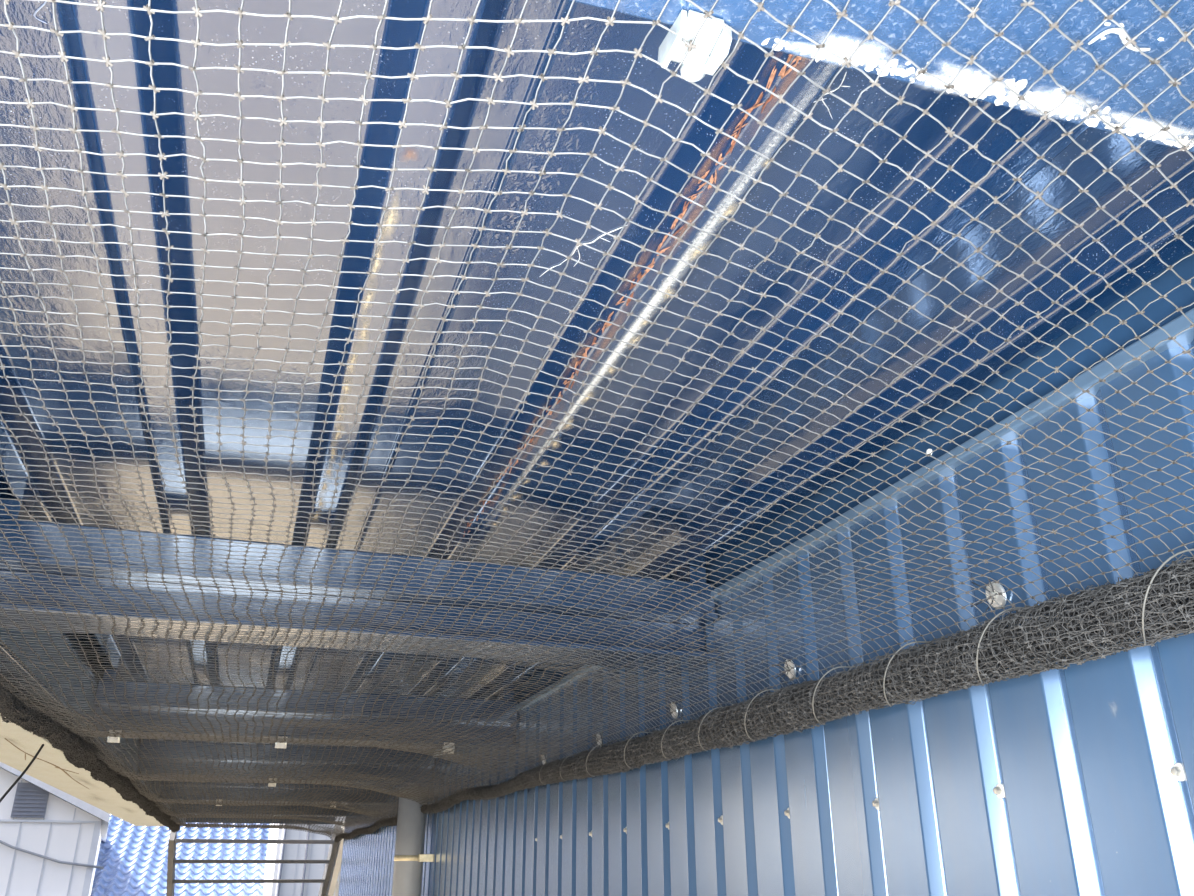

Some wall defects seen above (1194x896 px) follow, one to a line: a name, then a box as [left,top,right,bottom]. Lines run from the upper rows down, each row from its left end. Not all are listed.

peeling [1088,22,1164,52]
peeling [762,38,1194,149]
corrosion [464,54,806,535]